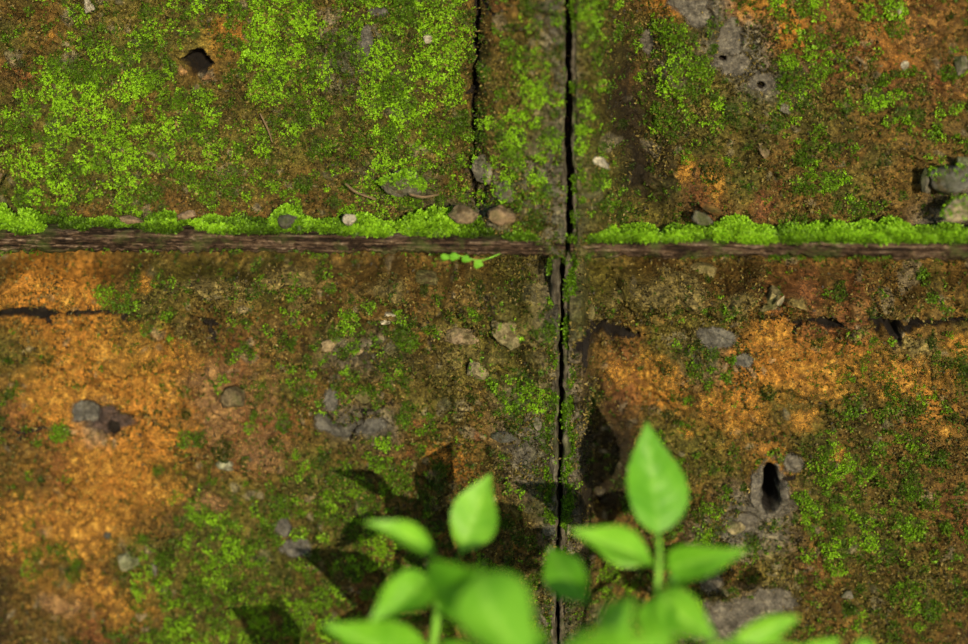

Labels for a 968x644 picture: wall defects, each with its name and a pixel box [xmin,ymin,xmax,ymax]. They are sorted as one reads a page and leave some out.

crack [466,0,496,205]
crack [0,306,131,325]
crack [789,316,845,334]
crack [868,314,968,350]